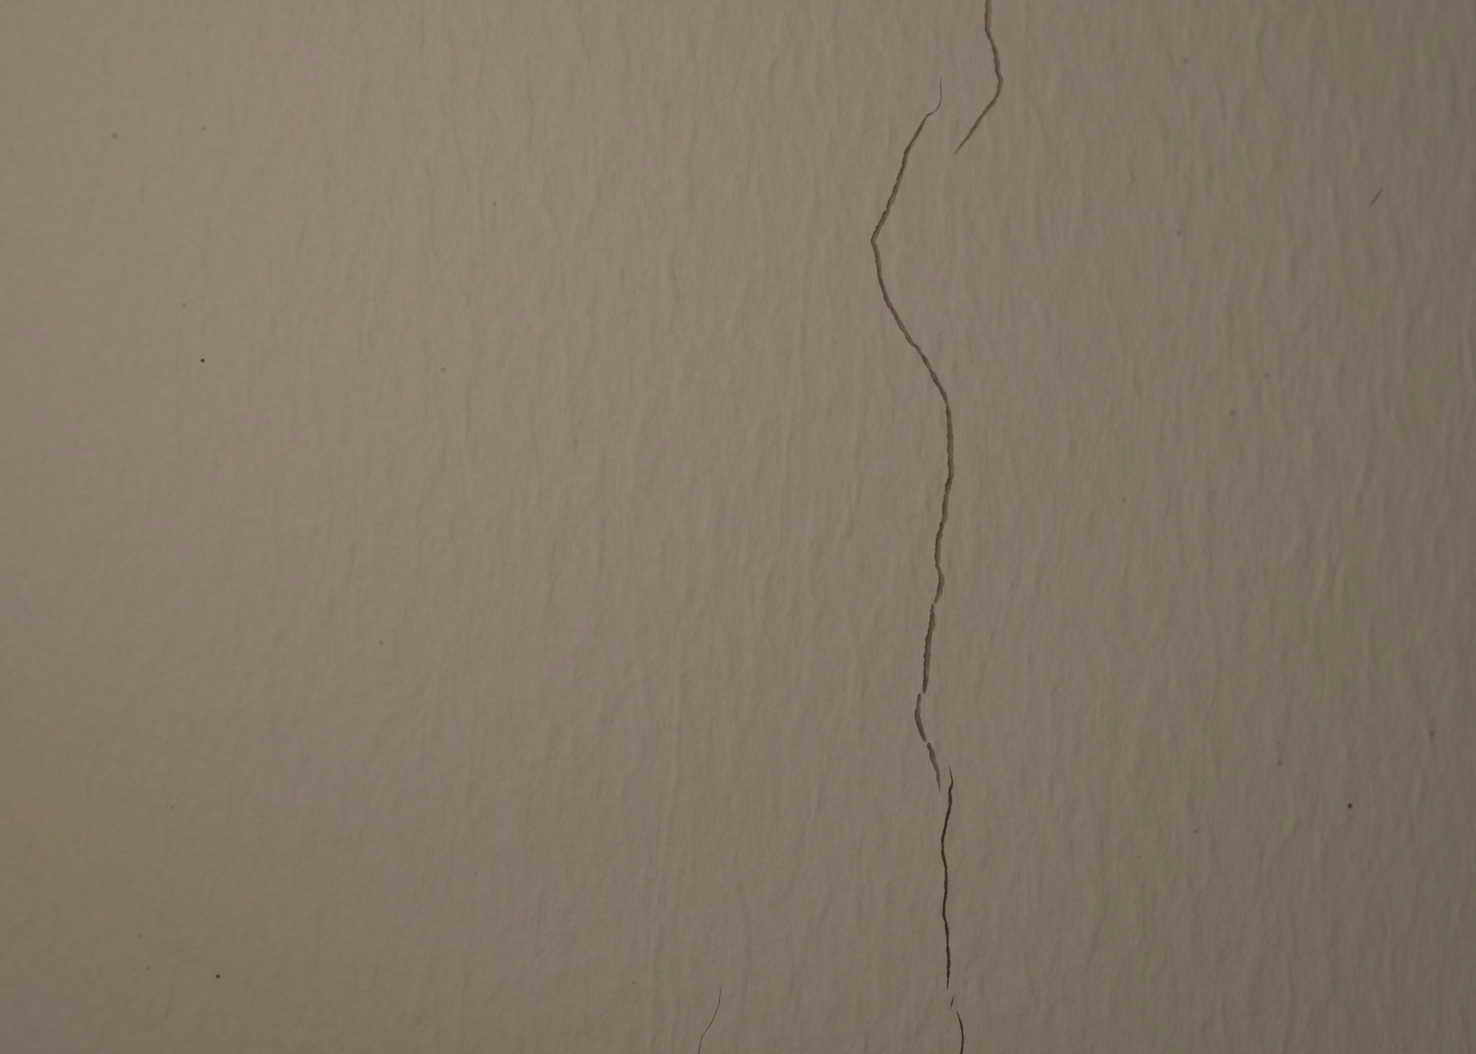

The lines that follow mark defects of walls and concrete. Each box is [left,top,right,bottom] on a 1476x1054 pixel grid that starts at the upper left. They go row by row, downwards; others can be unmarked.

crack [955,0,1003,154]
crack [871,78,964,1054]